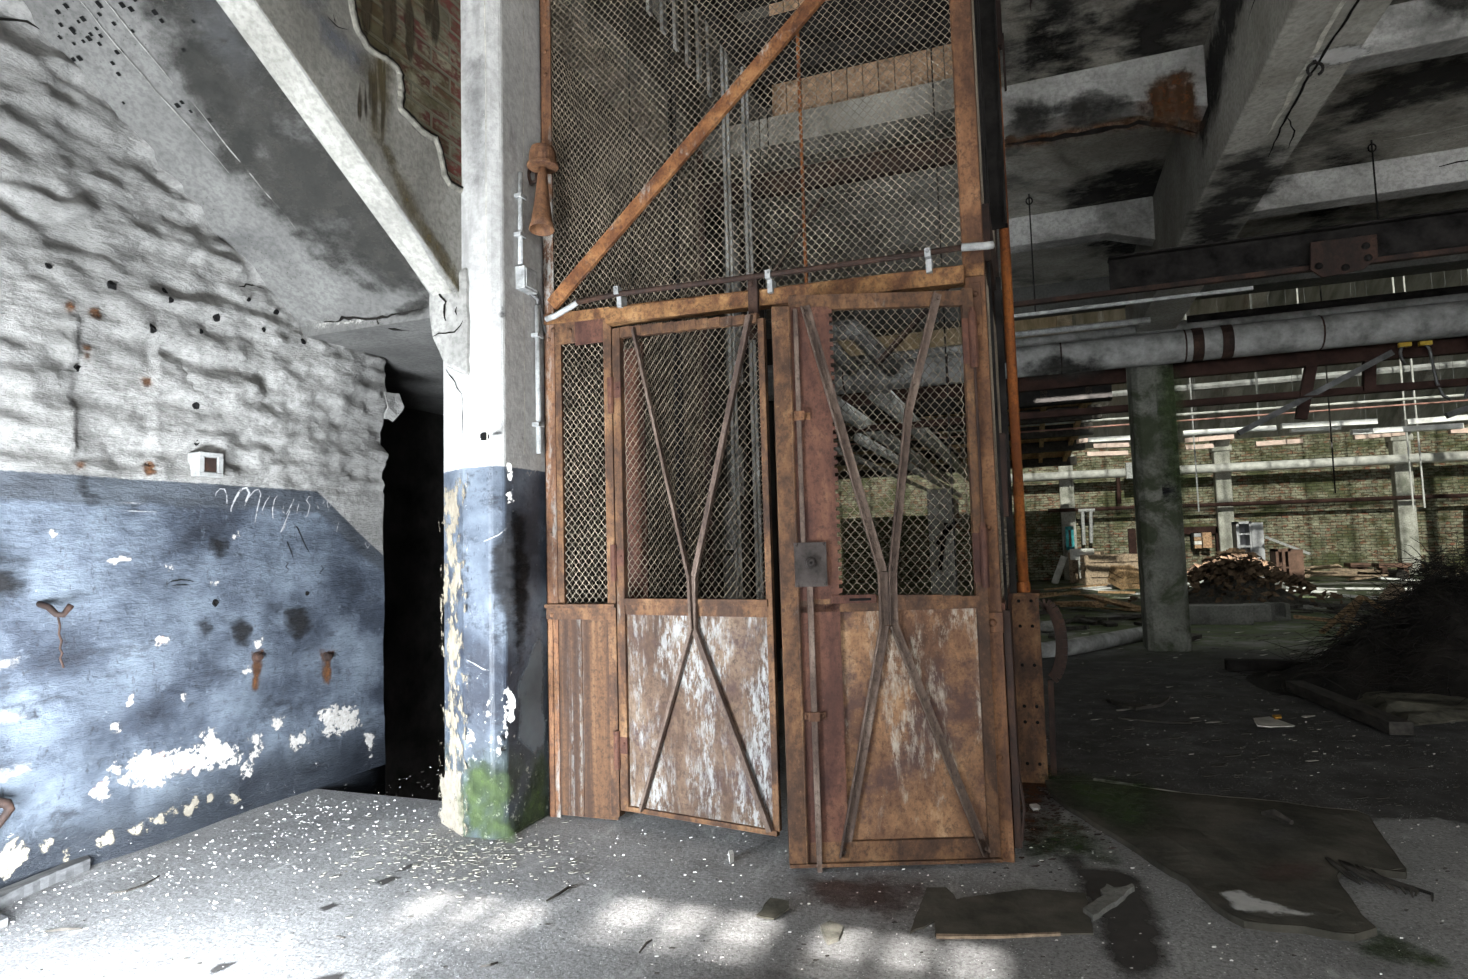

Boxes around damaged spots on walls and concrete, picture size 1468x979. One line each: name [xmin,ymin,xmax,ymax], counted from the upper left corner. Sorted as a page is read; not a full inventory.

crack [0,17,39,29]
spalling [348,0,463,193]
water stain [1006,0,1243,153]
rust [1140,69,1201,126]
crack [1267,0,1360,152]
water stain [1335,52,1468,124]
water stain [1061,160,1163,209]
water stain [490,511,530,663]
rust [252,650,264,690]
rust [320,651,334,684]
peeling [0,477,476,972]
peeling [486,689,516,756]